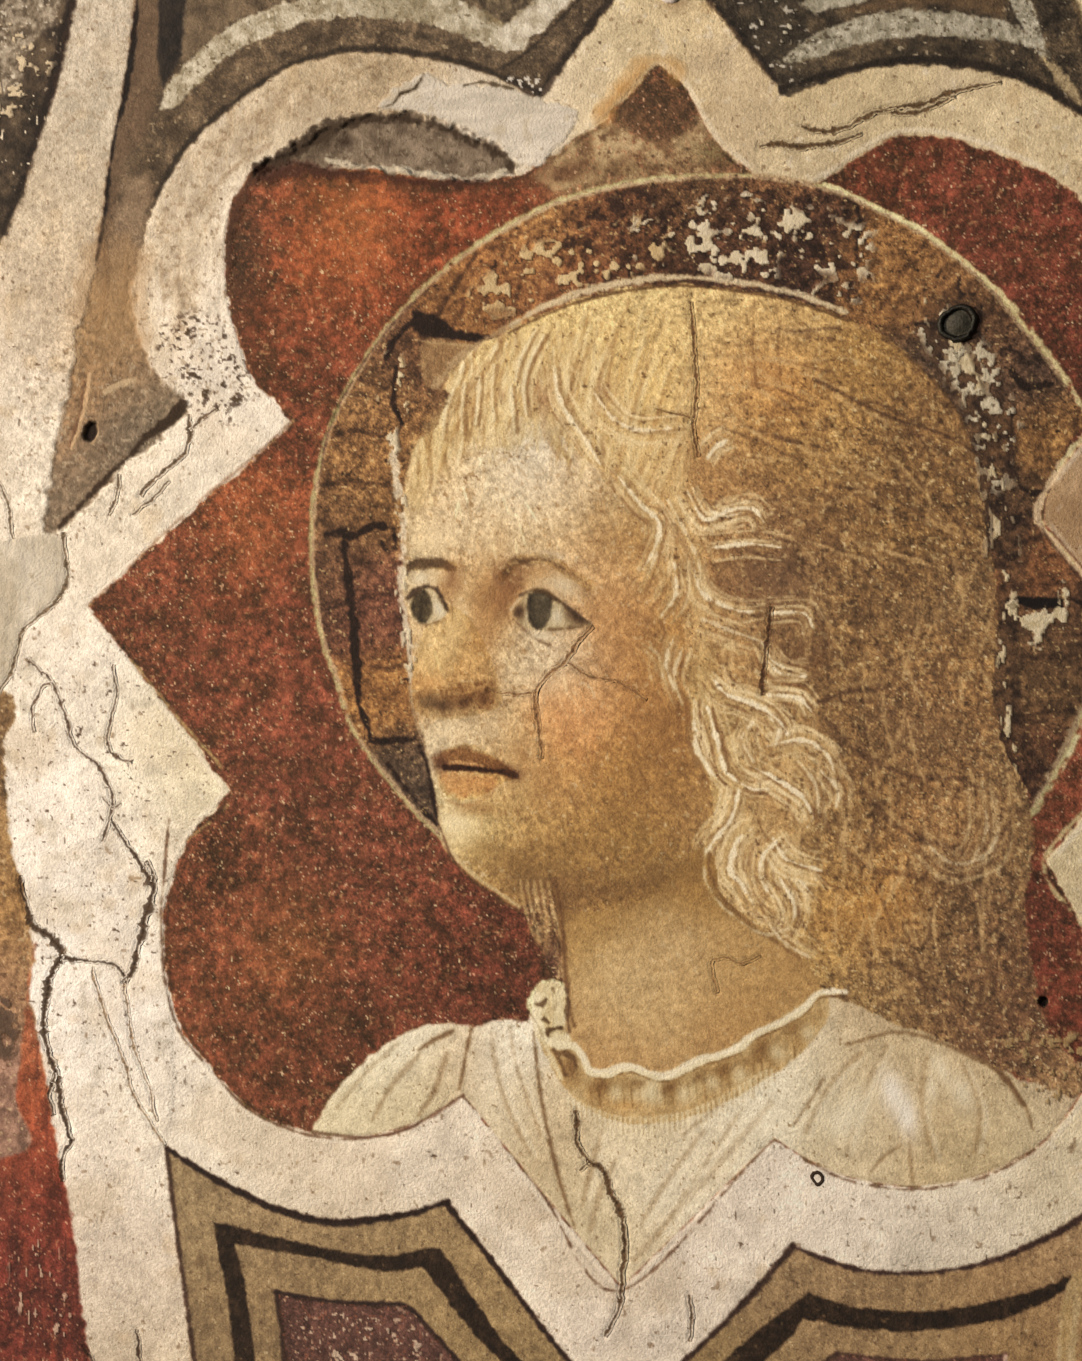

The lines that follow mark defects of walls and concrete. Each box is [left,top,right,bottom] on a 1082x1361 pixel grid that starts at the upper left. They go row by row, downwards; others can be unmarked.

crack [759,80,1001,152]
spalling [221,110,519,286]
peeling [464,190,883,321]
crack [0,482,15,539]
peeling [911,295,1071,775]
crack [488,624,647,759]
crack [0,532,166,1182]
crack [571,1110,629,1338]
crack [686,1294,695,1341]